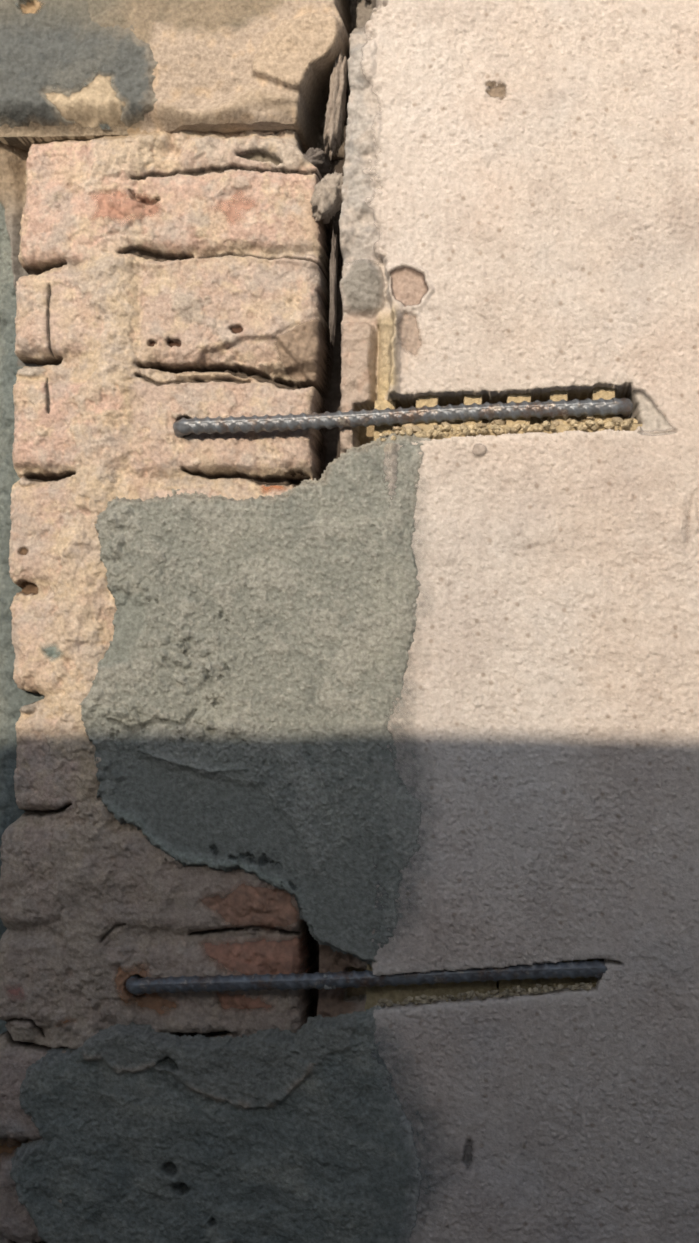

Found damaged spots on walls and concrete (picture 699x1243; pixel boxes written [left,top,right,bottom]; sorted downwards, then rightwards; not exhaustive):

spalling [238,151,281,166]
spalling [96,191,158,219]
spalling [339,27,428,355]
spalling [276,319,328,392]
spalling [19,581,38,595]